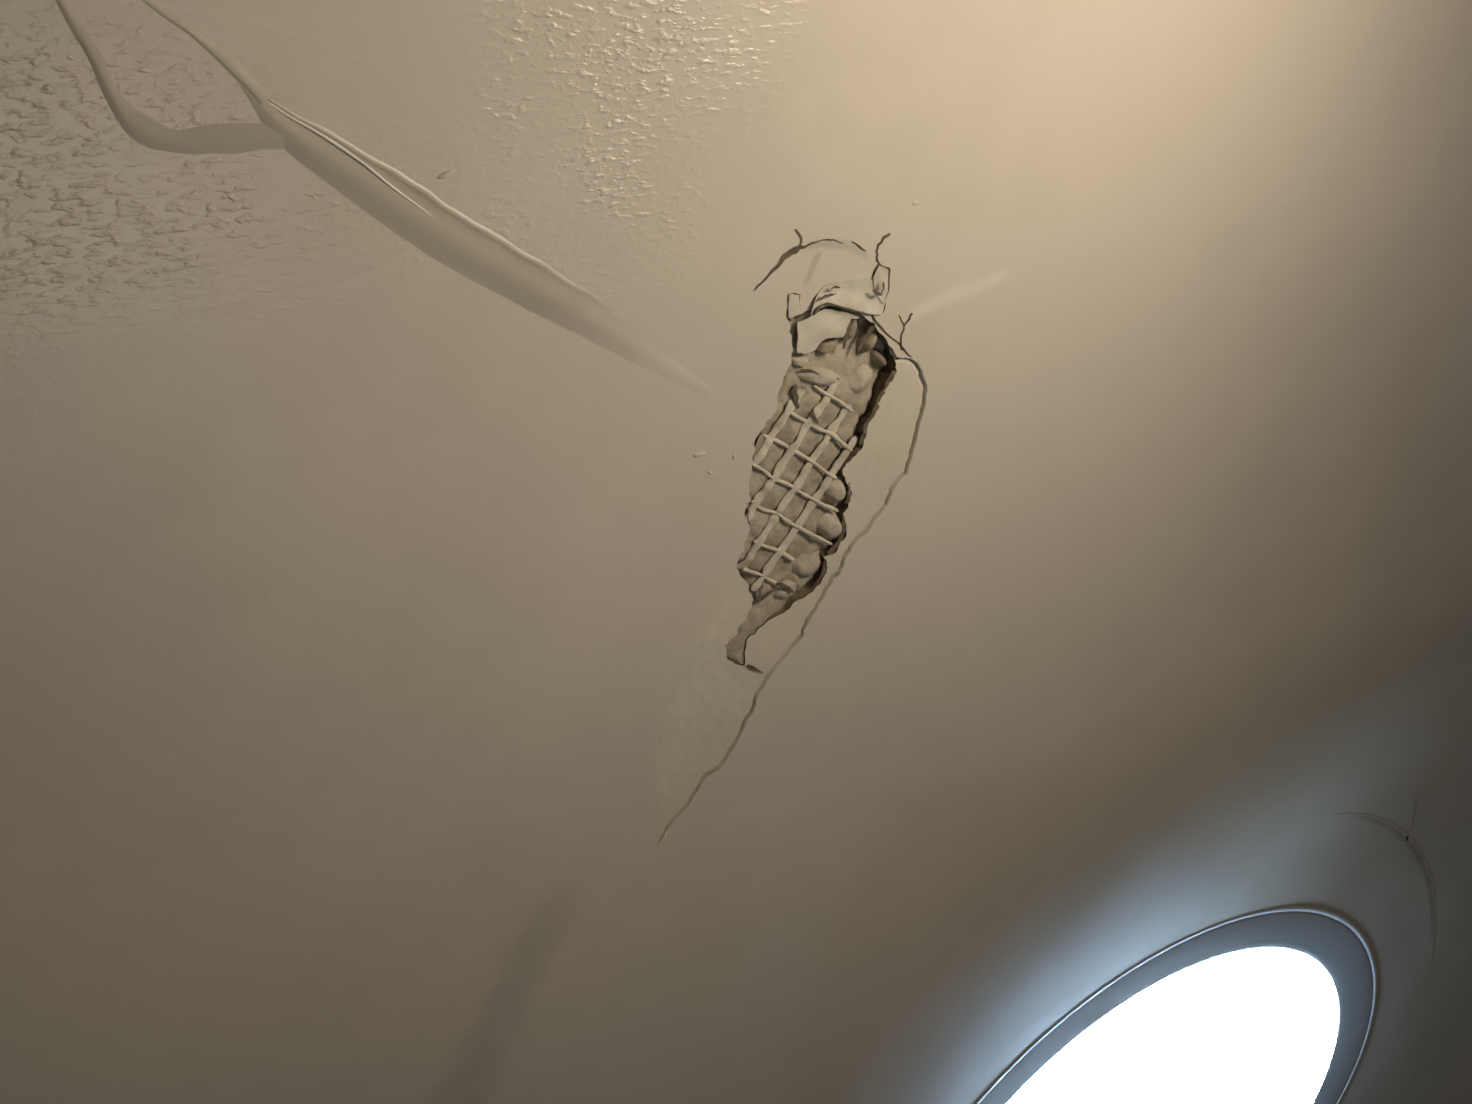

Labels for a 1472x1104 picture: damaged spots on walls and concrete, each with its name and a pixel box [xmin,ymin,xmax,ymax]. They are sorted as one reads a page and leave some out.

flaking render [655,266,929,846]